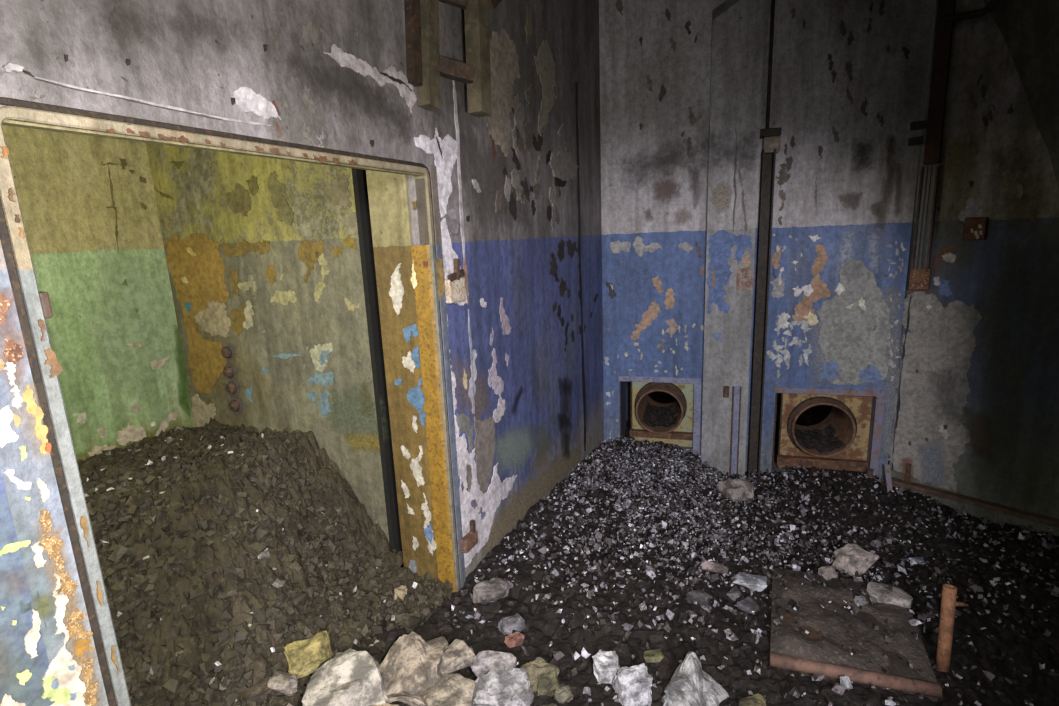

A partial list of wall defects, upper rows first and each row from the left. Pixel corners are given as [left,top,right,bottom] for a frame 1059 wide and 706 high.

corrosion [8,187,24,237]
corrosion [106,128,189,143]
peeling [389,128,470,315]
water stain [840,194,860,209]
water stain [872,137,900,228]
corrosion [3,339,24,409]
peeling [0,384,52,502]
corrosion [38,319,63,378]
peeling [454,297,517,568]
peeling [767,135,984,492]
peeling [401,445,437,578]
corrosion [38,510,99,706]